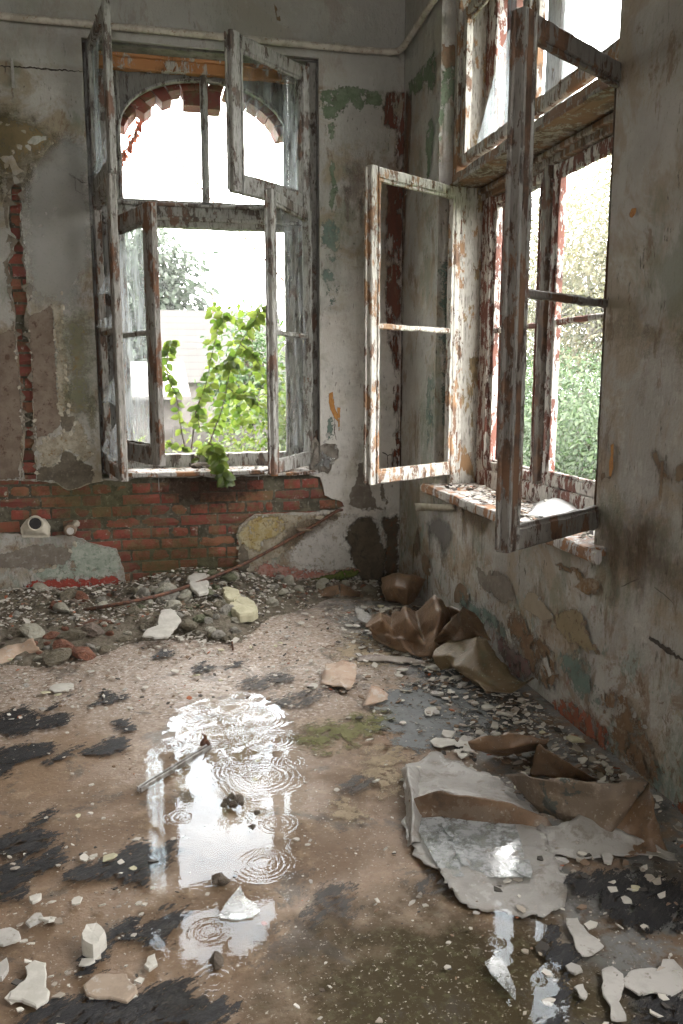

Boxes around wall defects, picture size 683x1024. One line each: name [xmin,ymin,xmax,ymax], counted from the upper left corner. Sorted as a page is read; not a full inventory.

crack [0,58,82,88]
peeling [319,85,383,140]
flaking render [0,160,389,591]
water stain [345,514,400,581]
peeling [454,564,683,814]